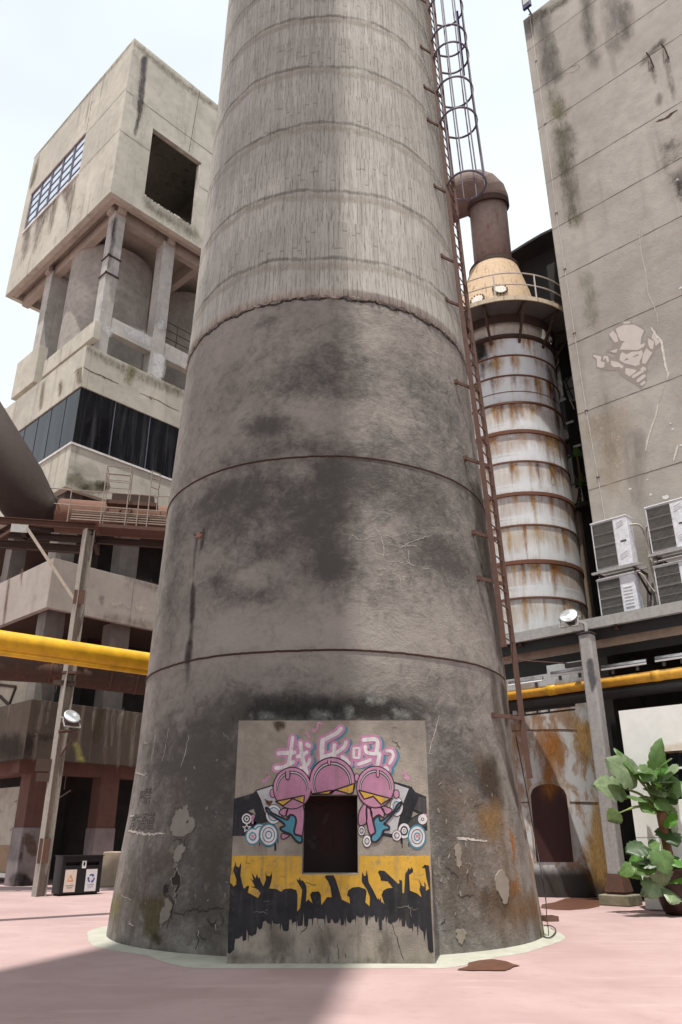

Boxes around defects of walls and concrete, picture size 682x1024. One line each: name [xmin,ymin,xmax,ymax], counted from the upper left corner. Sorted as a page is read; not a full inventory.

water stain [529,0,565,80]
water stain [134,56,147,136]
water stain [185,584,194,661]
corrosion [541,731,562,797]
corrosion [573,720,593,758]
peeling [141,794,196,927]
flaking render [429,772,477,903]
peeling [484,820,510,916]
corrosion [588,803,607,884]